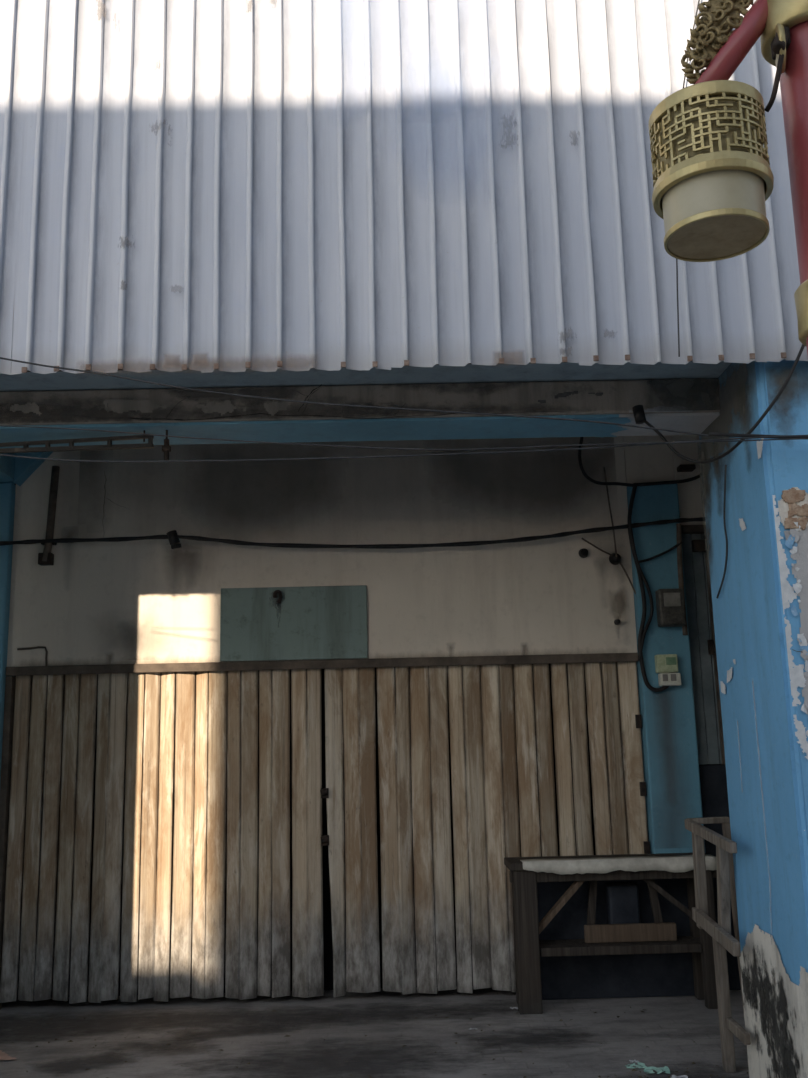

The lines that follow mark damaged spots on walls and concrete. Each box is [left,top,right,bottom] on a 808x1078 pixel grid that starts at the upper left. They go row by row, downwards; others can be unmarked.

water stain [0,386,555,422]
flaking render [772,487,808,759]
water stain [740,947,799,1078]
flaking render [739,924,808,1078]